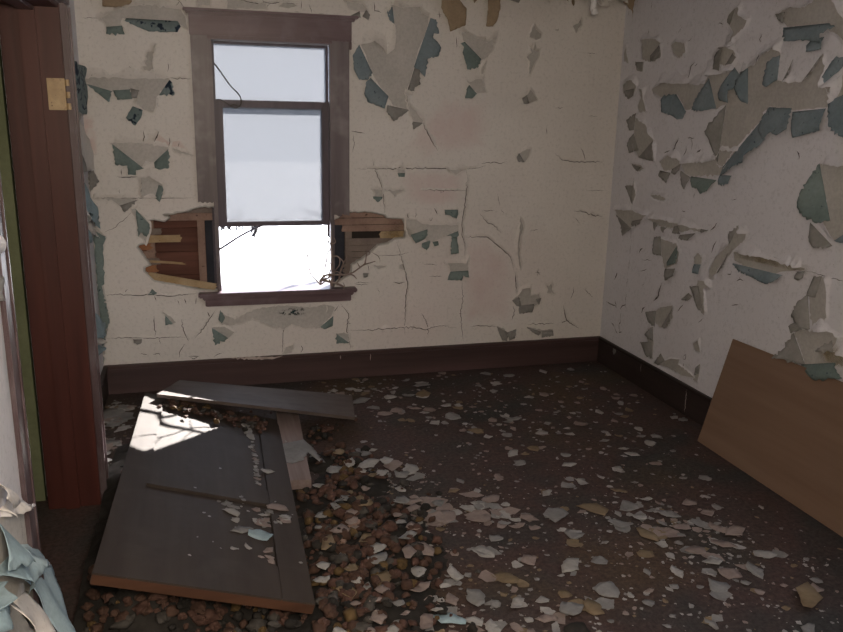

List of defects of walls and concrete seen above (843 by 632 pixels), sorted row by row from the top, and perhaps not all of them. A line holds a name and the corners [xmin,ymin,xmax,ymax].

peeling [225,0,299,11]
peeling [342,0,441,129]
peeling [456,27,499,98]
flaking render [74,0,218,365]
peeling [211,302,352,345]
flaking render [334,207,471,285]
crack [326,121,539,347]
peeling [613,0,843,281]
peeling [640,222,843,384]
peeling [0,484,76,632]